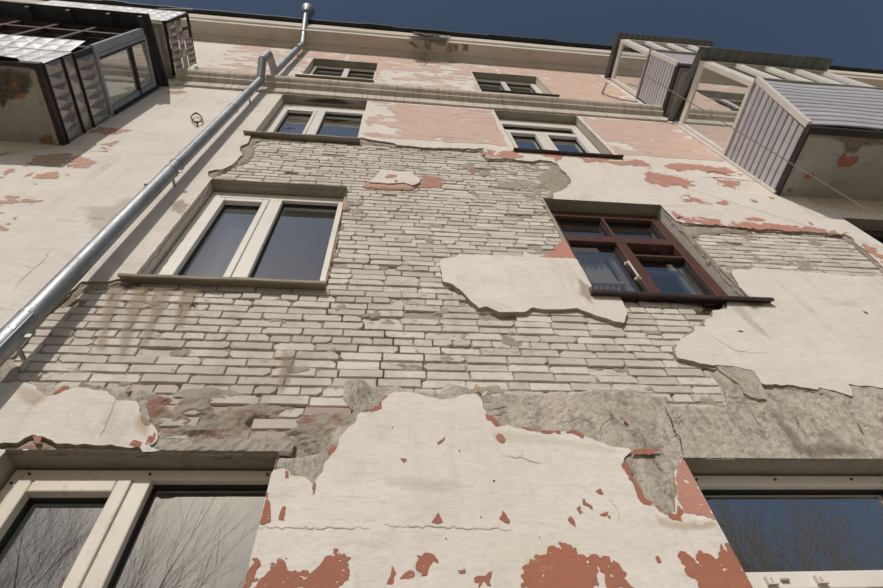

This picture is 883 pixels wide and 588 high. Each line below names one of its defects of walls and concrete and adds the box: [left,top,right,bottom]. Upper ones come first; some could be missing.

peeling [200,32,635,103]
flaking render [670,211,883,294]
flaking render [0,101,823,470]
crack [563,406,641,437]
crack [659,403,682,447]
peeling [621,448,716,521]
peeling [260,493,286,524]
peeling [243,548,351,588]
peeling [387,552,439,585]
peeling [458,569,492,587]
peeling [520,542,634,588]
peeling [678,543,753,588]